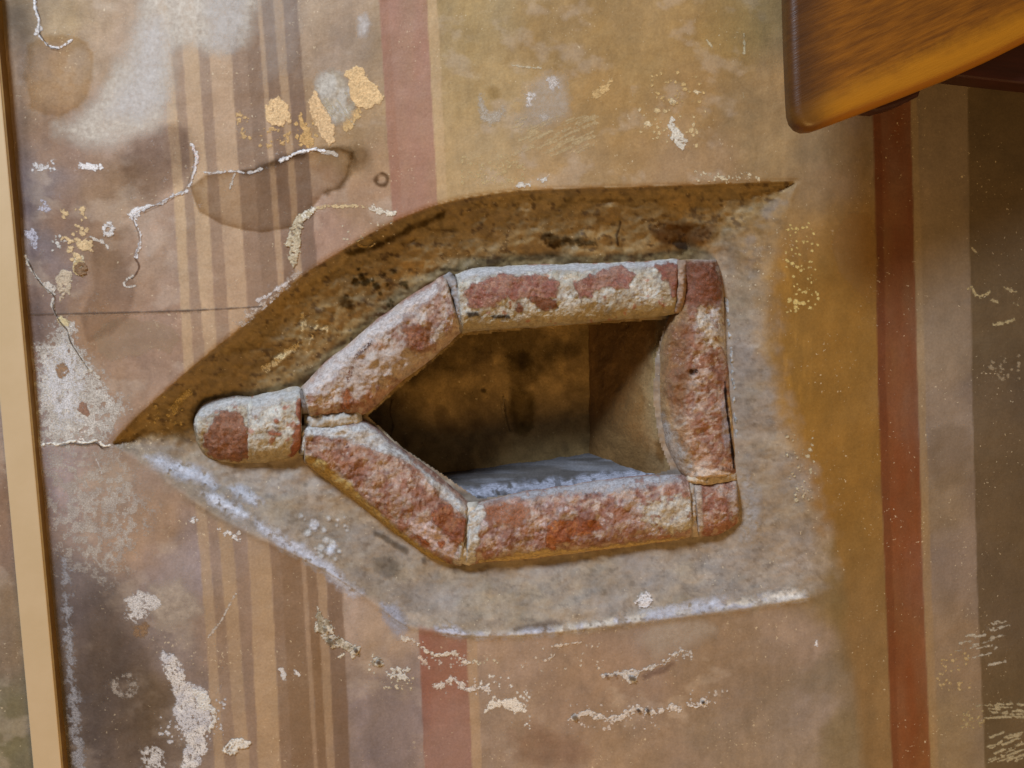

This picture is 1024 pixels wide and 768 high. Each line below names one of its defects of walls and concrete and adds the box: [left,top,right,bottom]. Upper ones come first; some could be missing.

crack [33,0,72,49]
peeling [236,65,384,149]
peeling [638,71,706,150]
peeling [52,206,115,301]
crack [123,143,338,288]
peeling [285,204,397,268]
crack [23,255,100,379]
crack [41,428,111,448]
crack [724,382,735,469]
damp [32,322,145,768]
peeling [223,738,251,756]